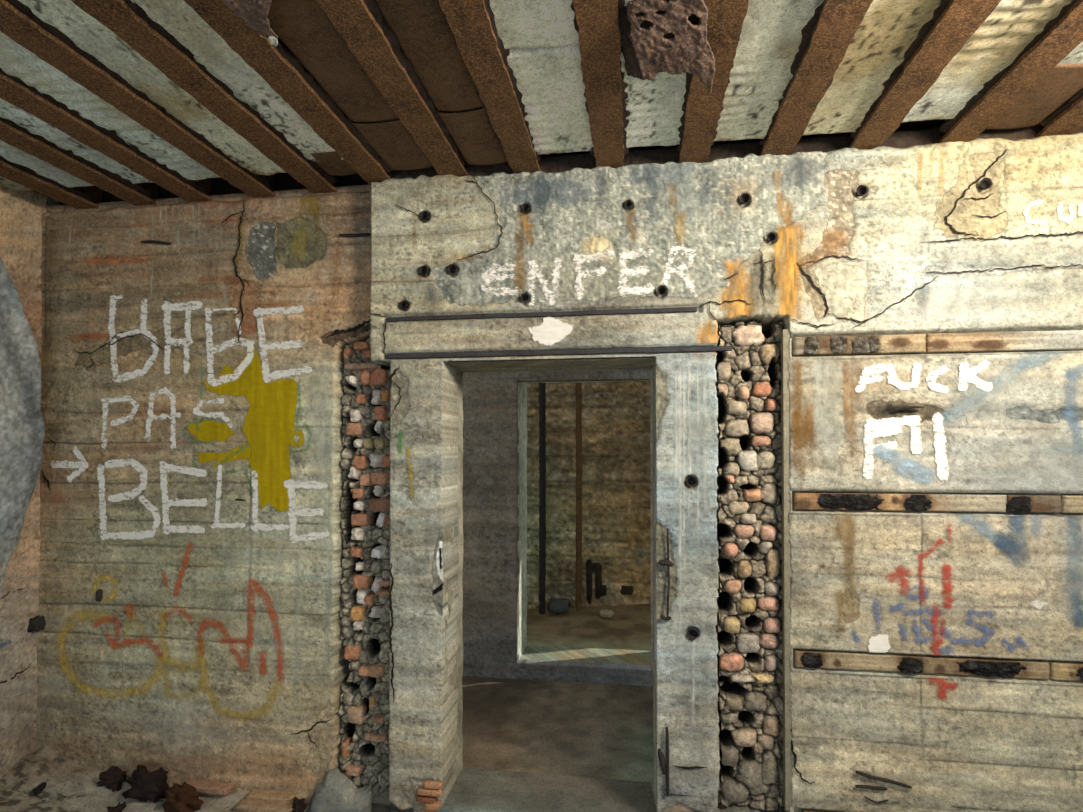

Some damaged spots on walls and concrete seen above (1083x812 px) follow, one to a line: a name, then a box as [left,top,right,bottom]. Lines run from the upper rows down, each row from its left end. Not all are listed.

rust [123,0,337,184]
rust [222,0,392,173]
rust [618,0,715,156]
crack [220,200,251,346]
spalling [230,215,327,330]
crack [457,173,503,260]
rust [722,263,753,319]
crack [699,250,1083,339]
crack [930,149,1083,242]
spalling [656,366,671,439]
spalling [299,323,444,812]
spalling [717,321,783,812]